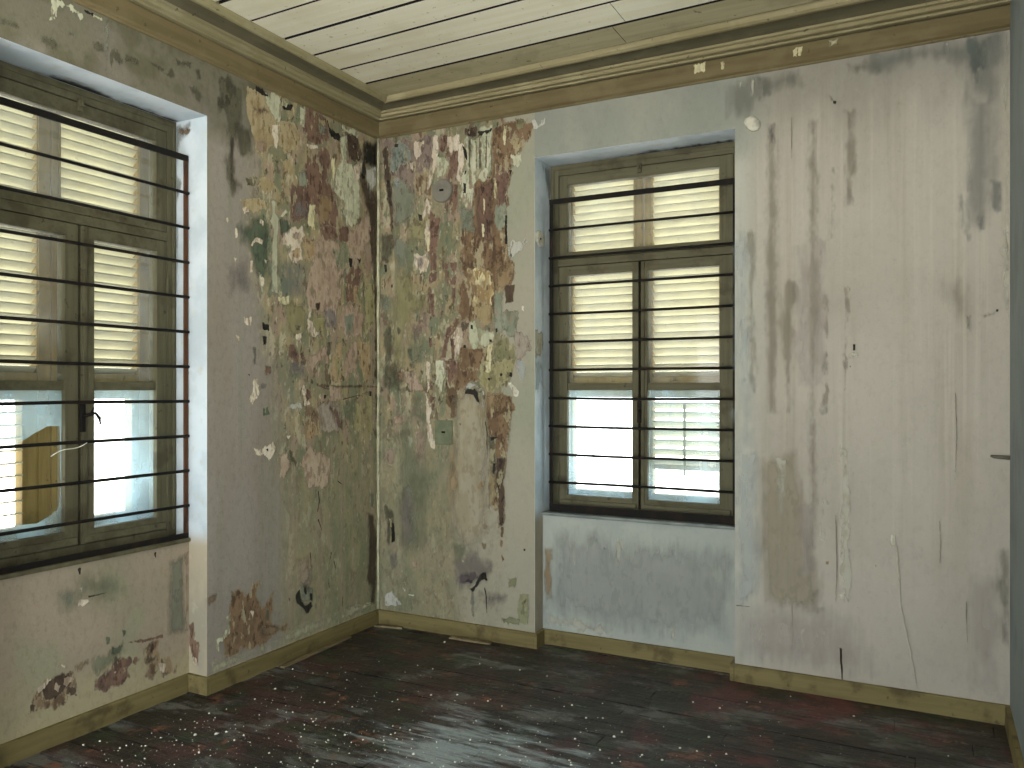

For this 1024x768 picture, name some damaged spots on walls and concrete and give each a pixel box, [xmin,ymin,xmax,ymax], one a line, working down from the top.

peeling [240,86,546,489]
flaking render [485,392,516,528]
crack [952,393,960,468]
leakage [765,458,812,605]
flaking render [28,630,177,714]
flaking render [189,622,200,666]
flaking render [216,581,288,658]